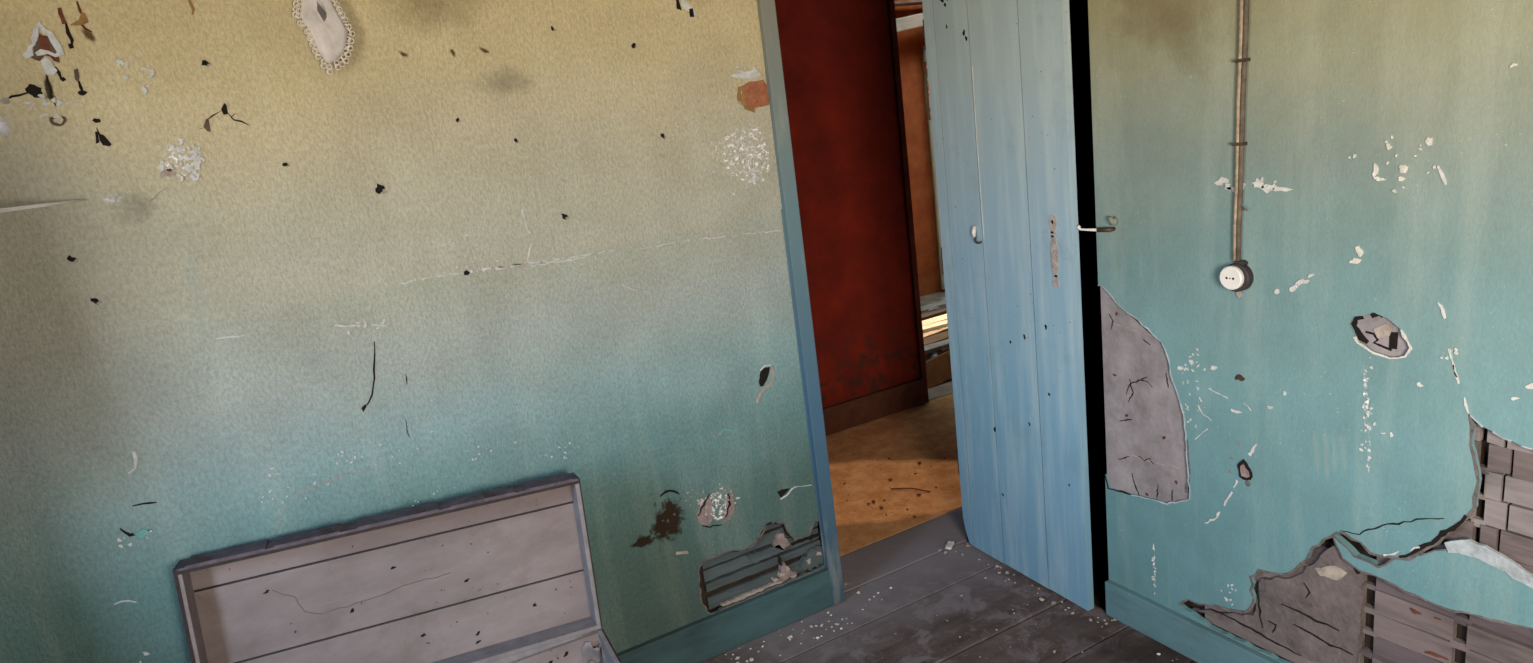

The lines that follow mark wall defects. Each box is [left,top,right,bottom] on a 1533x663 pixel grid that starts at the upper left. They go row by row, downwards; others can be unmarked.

flaking render [0,1,94,133]
flaking render [660,66,770,198]
peeling [1214,177,1293,193]
flaking render [755,365,775,403]
flaking render [1098,285,1287,505]
spalling [1351,312,1412,359]
flaking render [632,483,824,615]
flaking render [1178,414,1533,663]